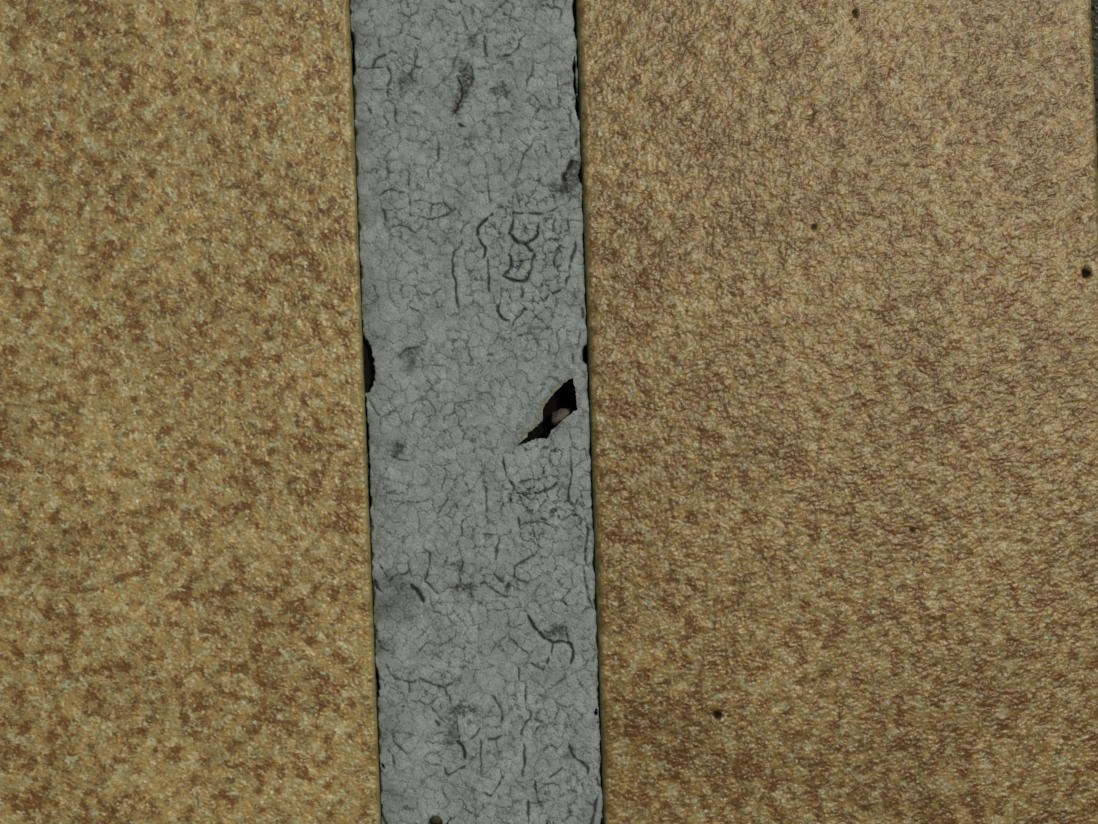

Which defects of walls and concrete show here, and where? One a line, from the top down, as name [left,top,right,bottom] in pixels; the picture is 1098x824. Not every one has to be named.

crack [477,214,538,290]
crack [410,584,424,602]
crack [528,616,573,663]